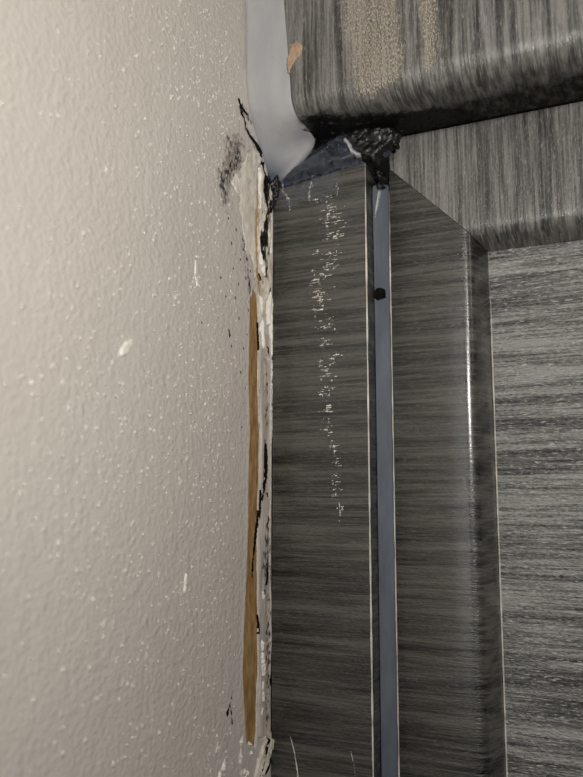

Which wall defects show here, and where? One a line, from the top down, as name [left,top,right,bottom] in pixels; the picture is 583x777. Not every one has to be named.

damp [219,136,241,202]
crack [238,98,272,253]
peeling [231,149,274,777]